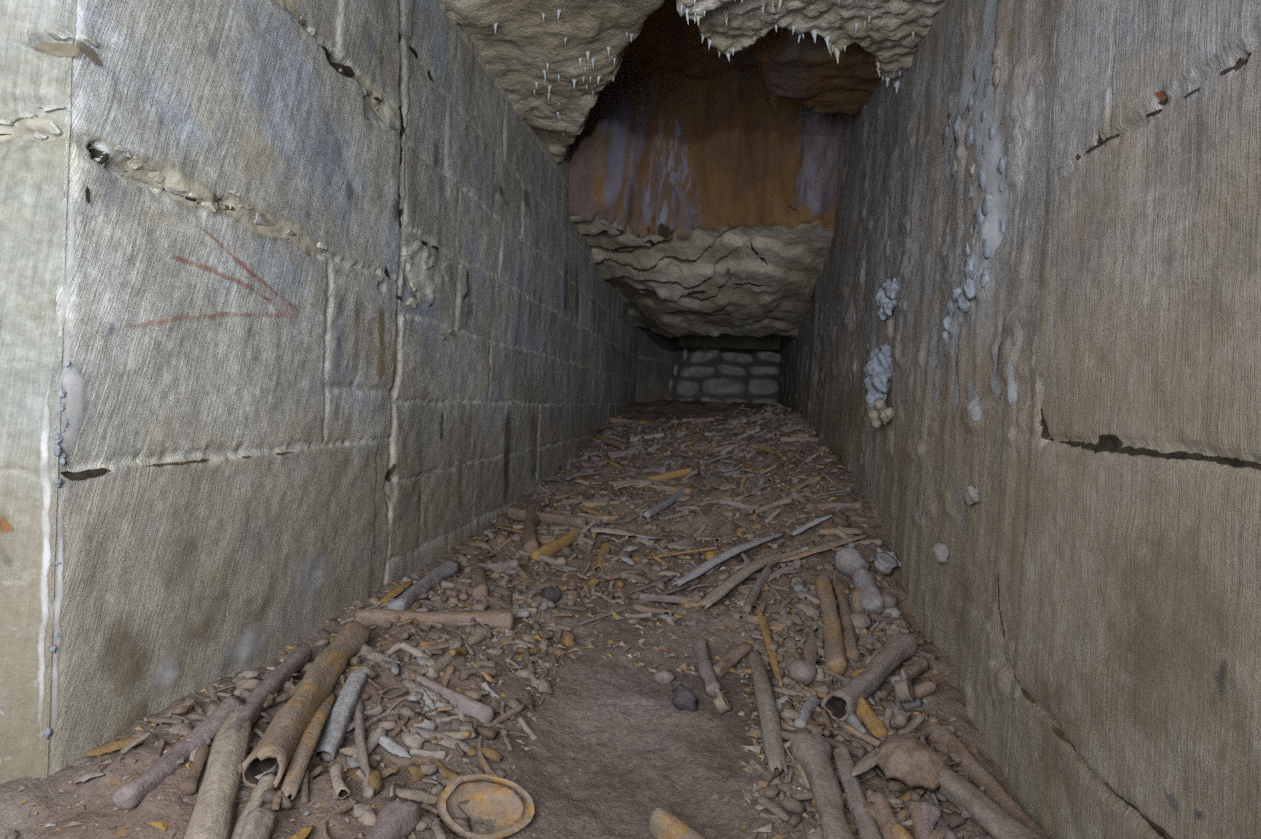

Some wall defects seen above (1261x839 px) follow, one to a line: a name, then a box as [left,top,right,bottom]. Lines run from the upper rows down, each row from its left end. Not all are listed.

crack [1146,52,1251,118]
crack [0,126,18,142]
crack [1058,134,1120,169]
water stain [872,145,903,320]
water stain [924,0,1010,421]
water stain [863,343,895,429]
water stain [991,316,1018,403]